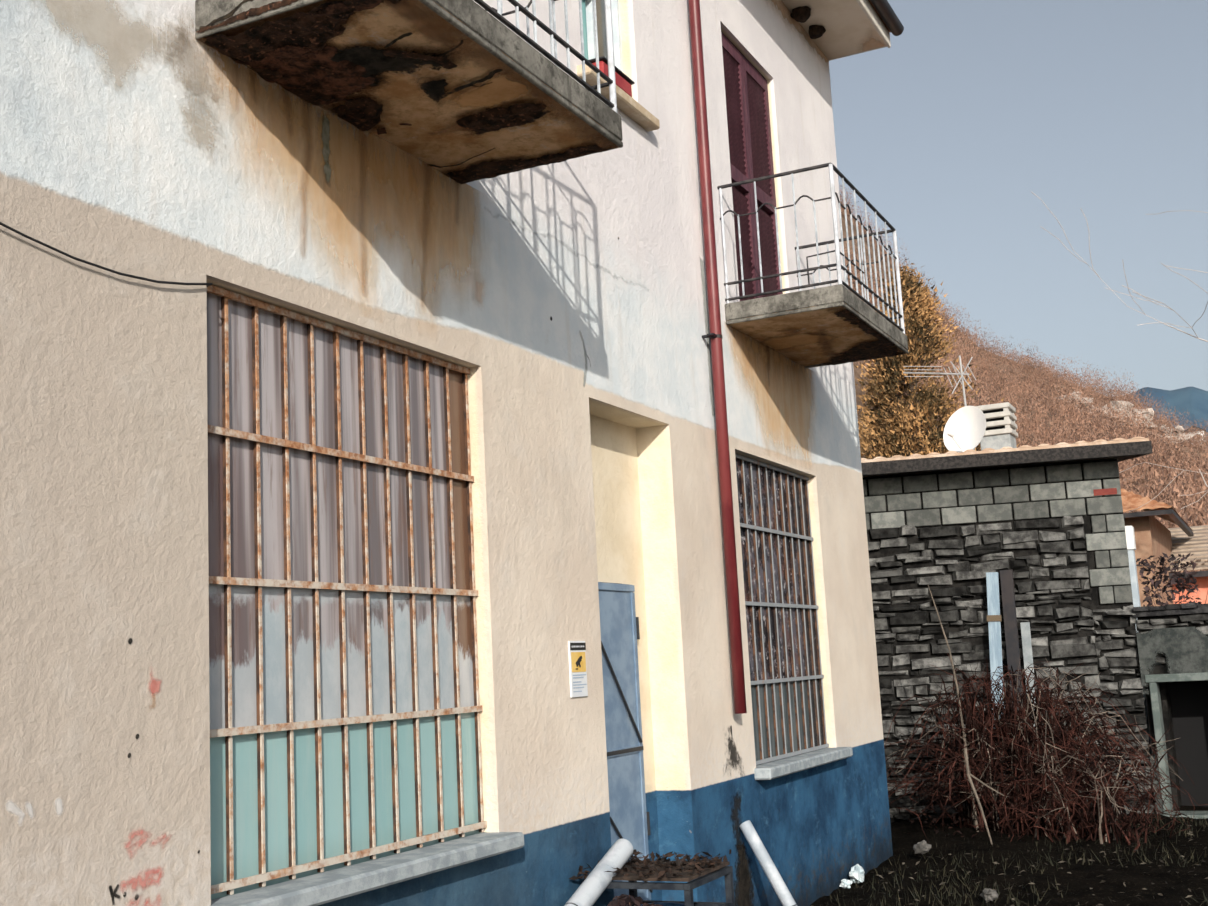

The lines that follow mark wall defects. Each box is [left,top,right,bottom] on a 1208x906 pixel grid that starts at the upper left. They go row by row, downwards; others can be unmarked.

spalling [432,102,550,135]
spalling [445,145,611,184]
flaking render [1136,627,1208,695]
damp [726,726,744,775]
damp [730,793,754,906]